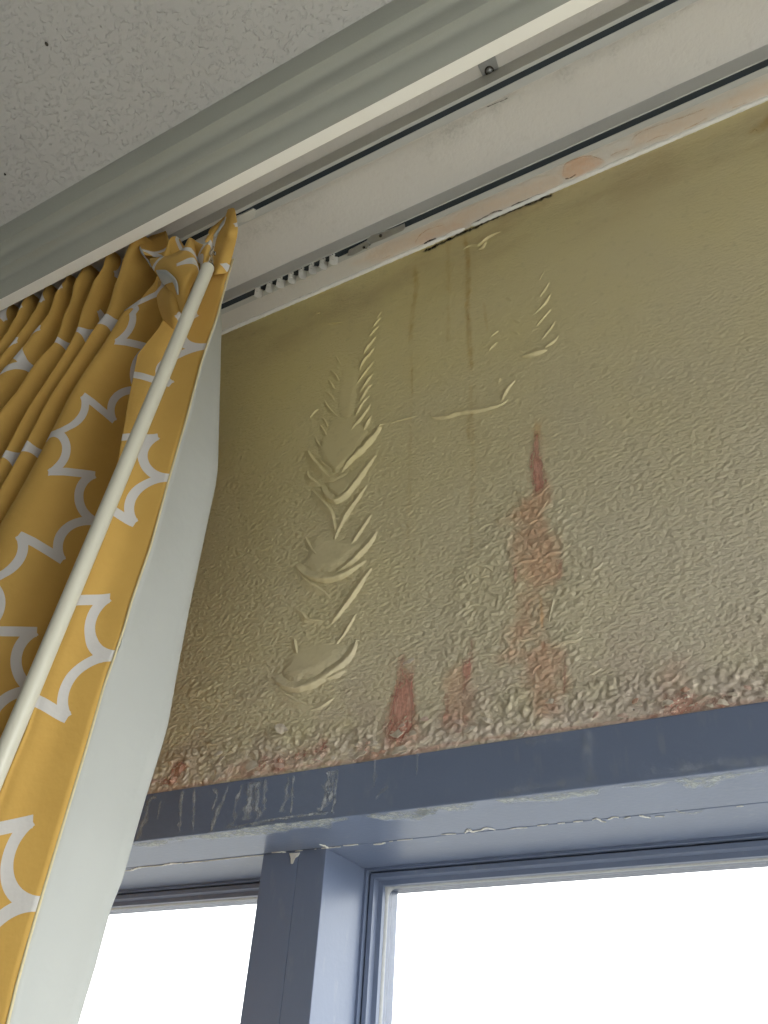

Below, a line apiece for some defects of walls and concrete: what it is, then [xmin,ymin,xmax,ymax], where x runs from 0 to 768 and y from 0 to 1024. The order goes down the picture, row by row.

crack [441,815,664,835]
crack [125,839,412,871]